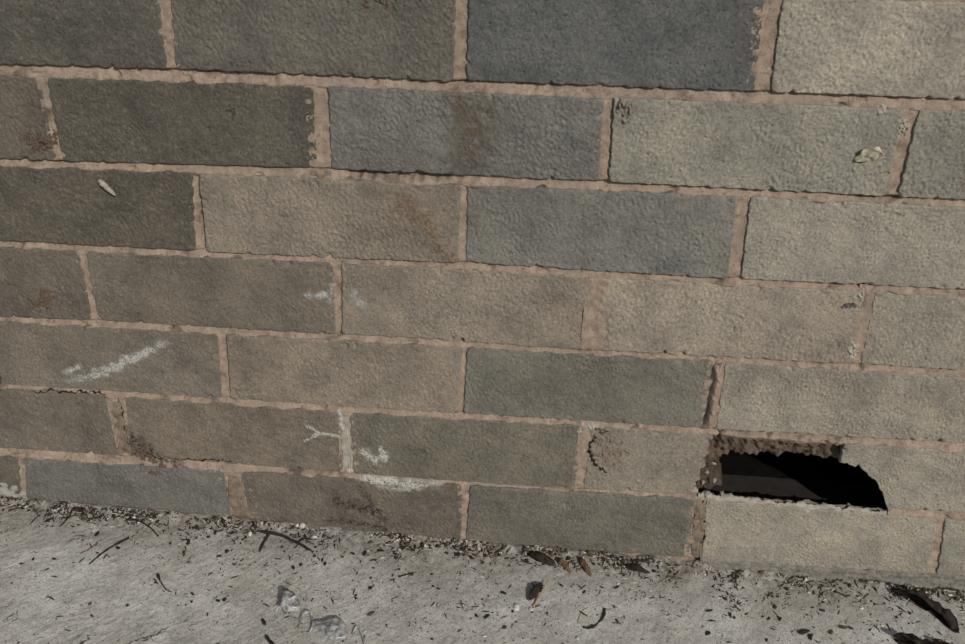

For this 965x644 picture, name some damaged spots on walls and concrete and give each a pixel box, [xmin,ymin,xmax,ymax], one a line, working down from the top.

spalling [691,451,888,558]